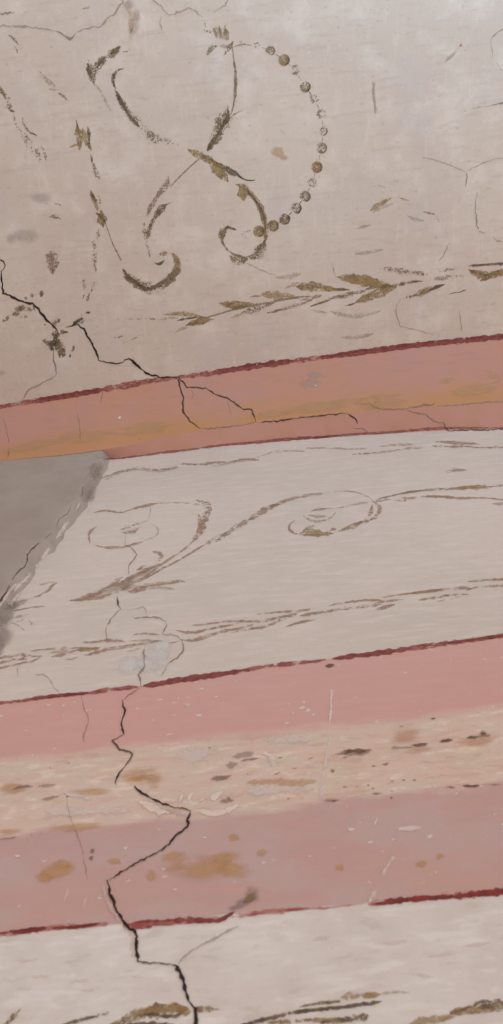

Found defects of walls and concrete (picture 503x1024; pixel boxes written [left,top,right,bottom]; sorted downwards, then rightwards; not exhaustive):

crack [0,259,503,432]
crack [102,598,198,1024]